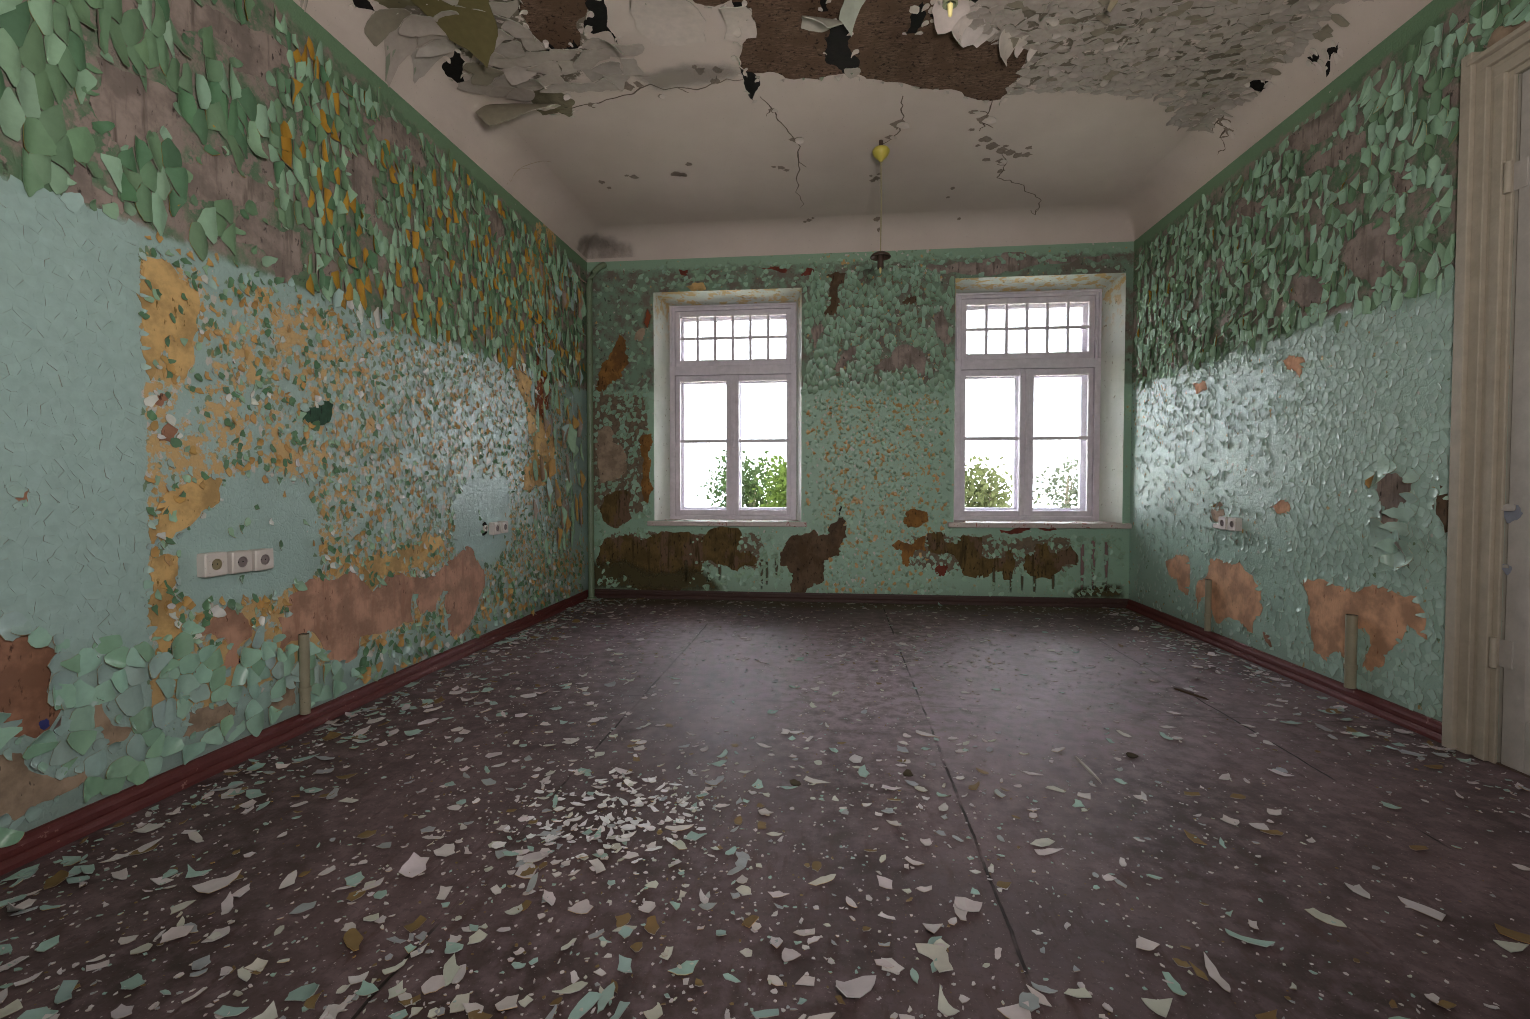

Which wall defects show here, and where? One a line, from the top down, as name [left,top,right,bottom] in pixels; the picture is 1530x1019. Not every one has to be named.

peeling [0,0,1126,848]
crack [547,76,806,207]
peeling [692,0,1374,133]
peeling [1133,0,1530,718]